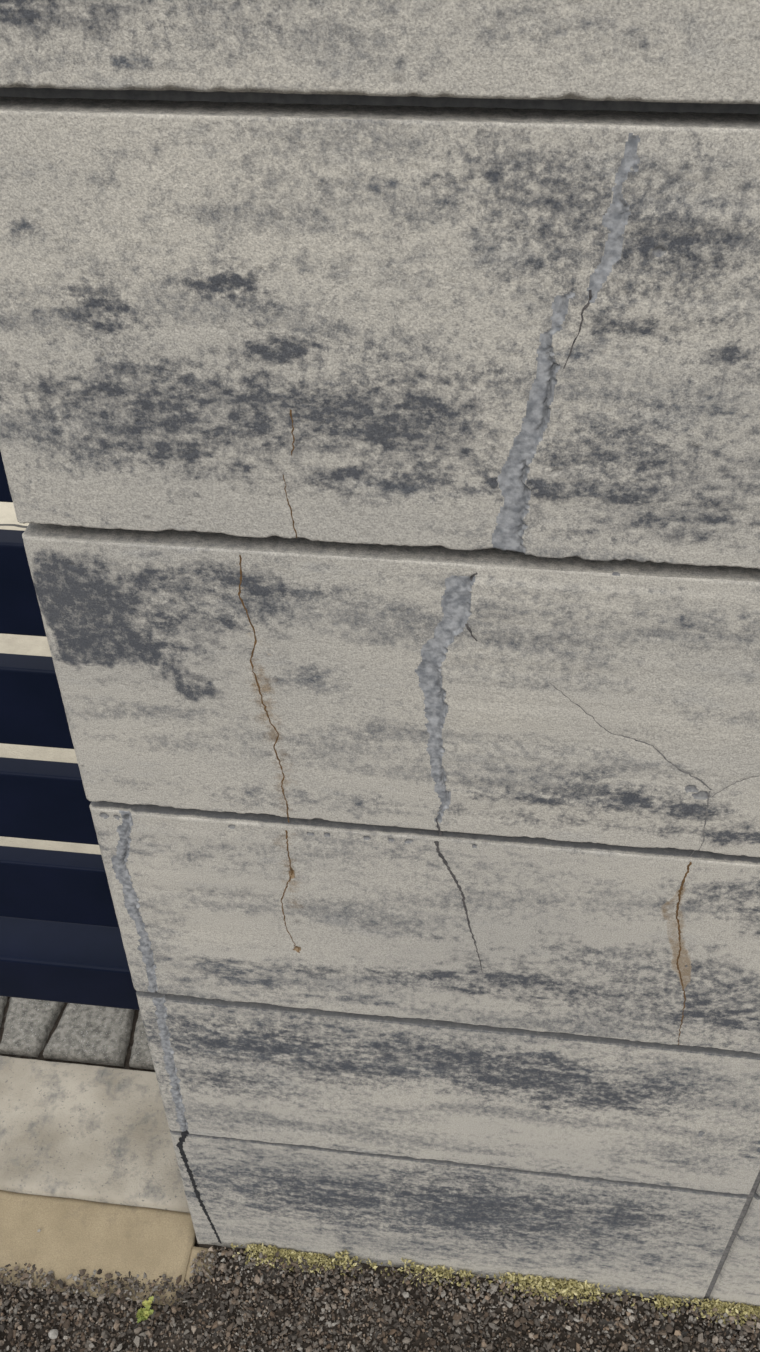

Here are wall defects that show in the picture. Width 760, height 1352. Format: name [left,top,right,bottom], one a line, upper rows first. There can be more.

leakage [530,76,576,100]
leakage [706,83,760,104]
crack [283,410,297,538]
leakage [0,121,760,721]
crack [415,133,641,973]
crack [111,810,222,1244]
crack [238,555,300,953]
corrosion [242,624,311,925]
crack [550,683,758,1045]
corrosion [660,885,692,989]